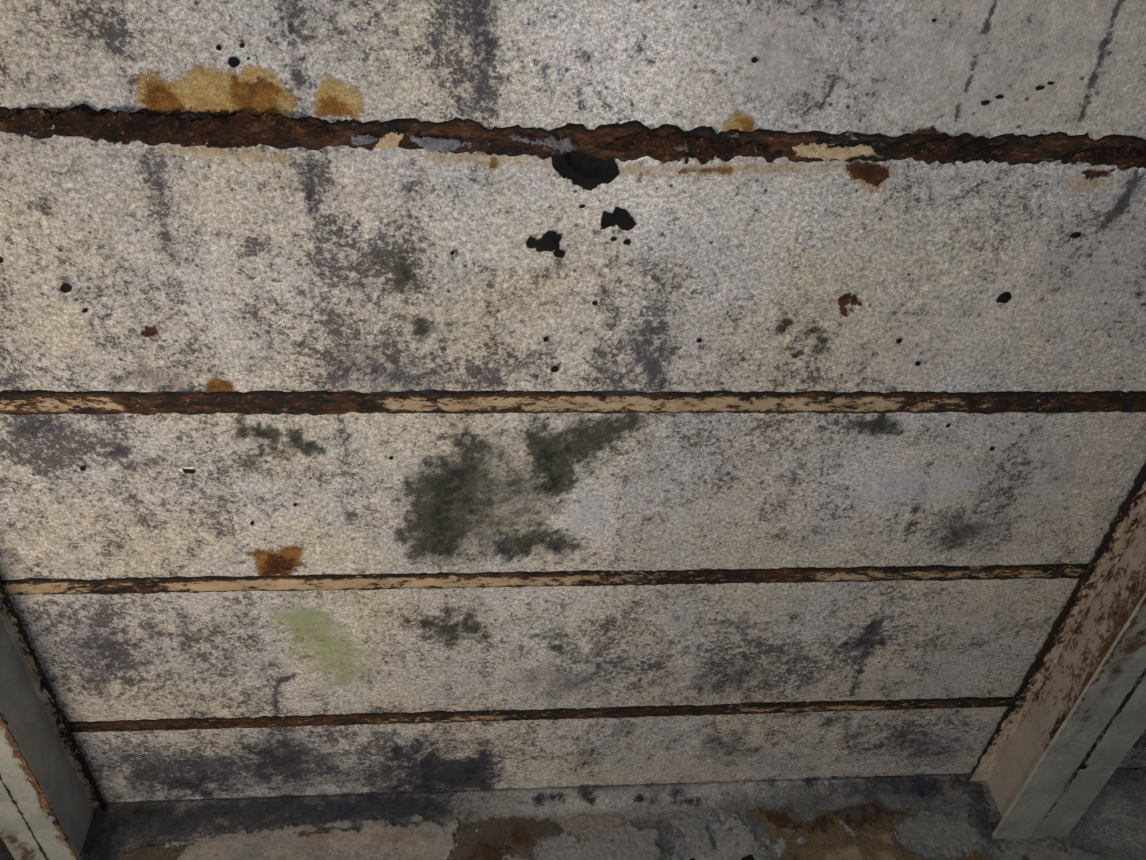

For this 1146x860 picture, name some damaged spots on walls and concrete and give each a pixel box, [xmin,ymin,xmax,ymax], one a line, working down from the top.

corrosion [0,64,363,149]
peeling [410,135,472,154]
hole [551,152,620,191]
corrosion [594,111,779,175]
corrosion [837,126,1009,188]
corrosion [1061,143,1146,180]
hole [600,207,636,245]
corrosion [204,379,234,393]
mould [394,413,648,571]
corrosion [246,545,306,576]